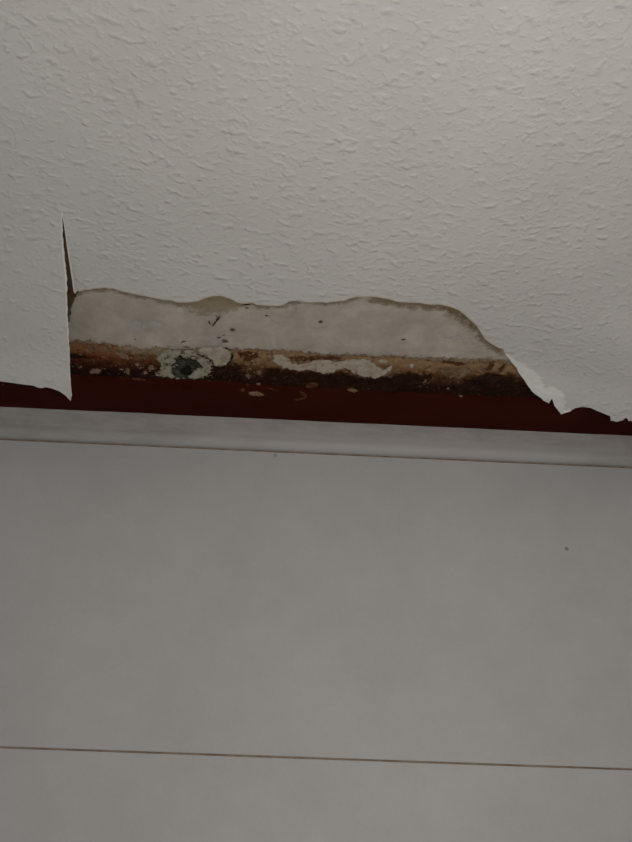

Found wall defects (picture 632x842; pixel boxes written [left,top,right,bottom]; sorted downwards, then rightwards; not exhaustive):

damp [78,288,301,326]
peeling [68,288,516,396]
damp [155,297,540,400]